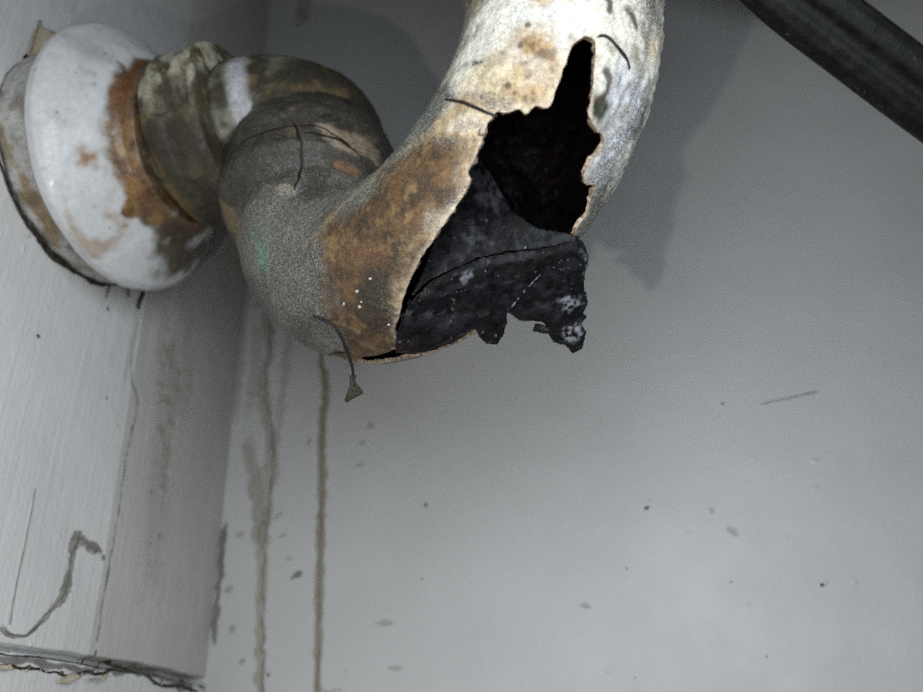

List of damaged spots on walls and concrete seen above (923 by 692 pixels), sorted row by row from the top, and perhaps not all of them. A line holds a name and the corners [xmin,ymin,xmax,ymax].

crack [0,650,204,692]